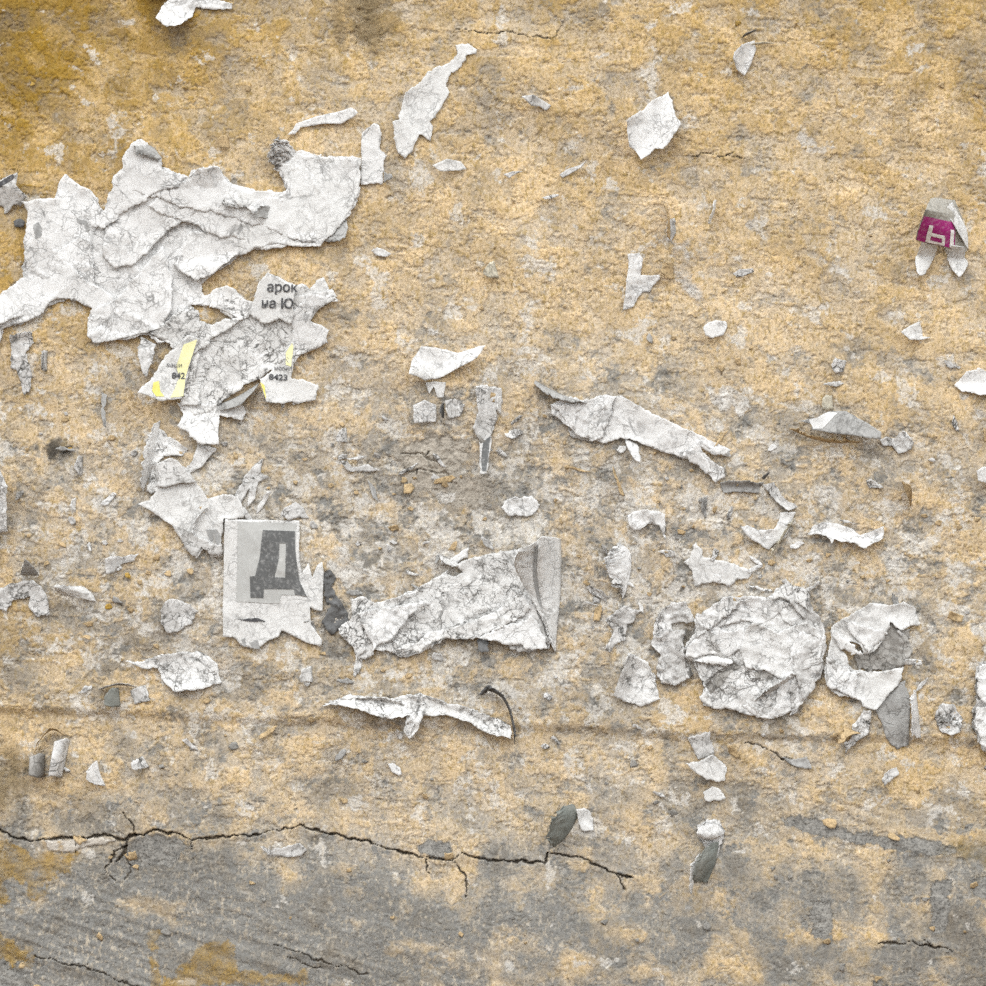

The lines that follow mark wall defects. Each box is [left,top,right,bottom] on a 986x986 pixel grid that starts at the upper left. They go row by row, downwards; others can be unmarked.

crack [0,819,632,897]